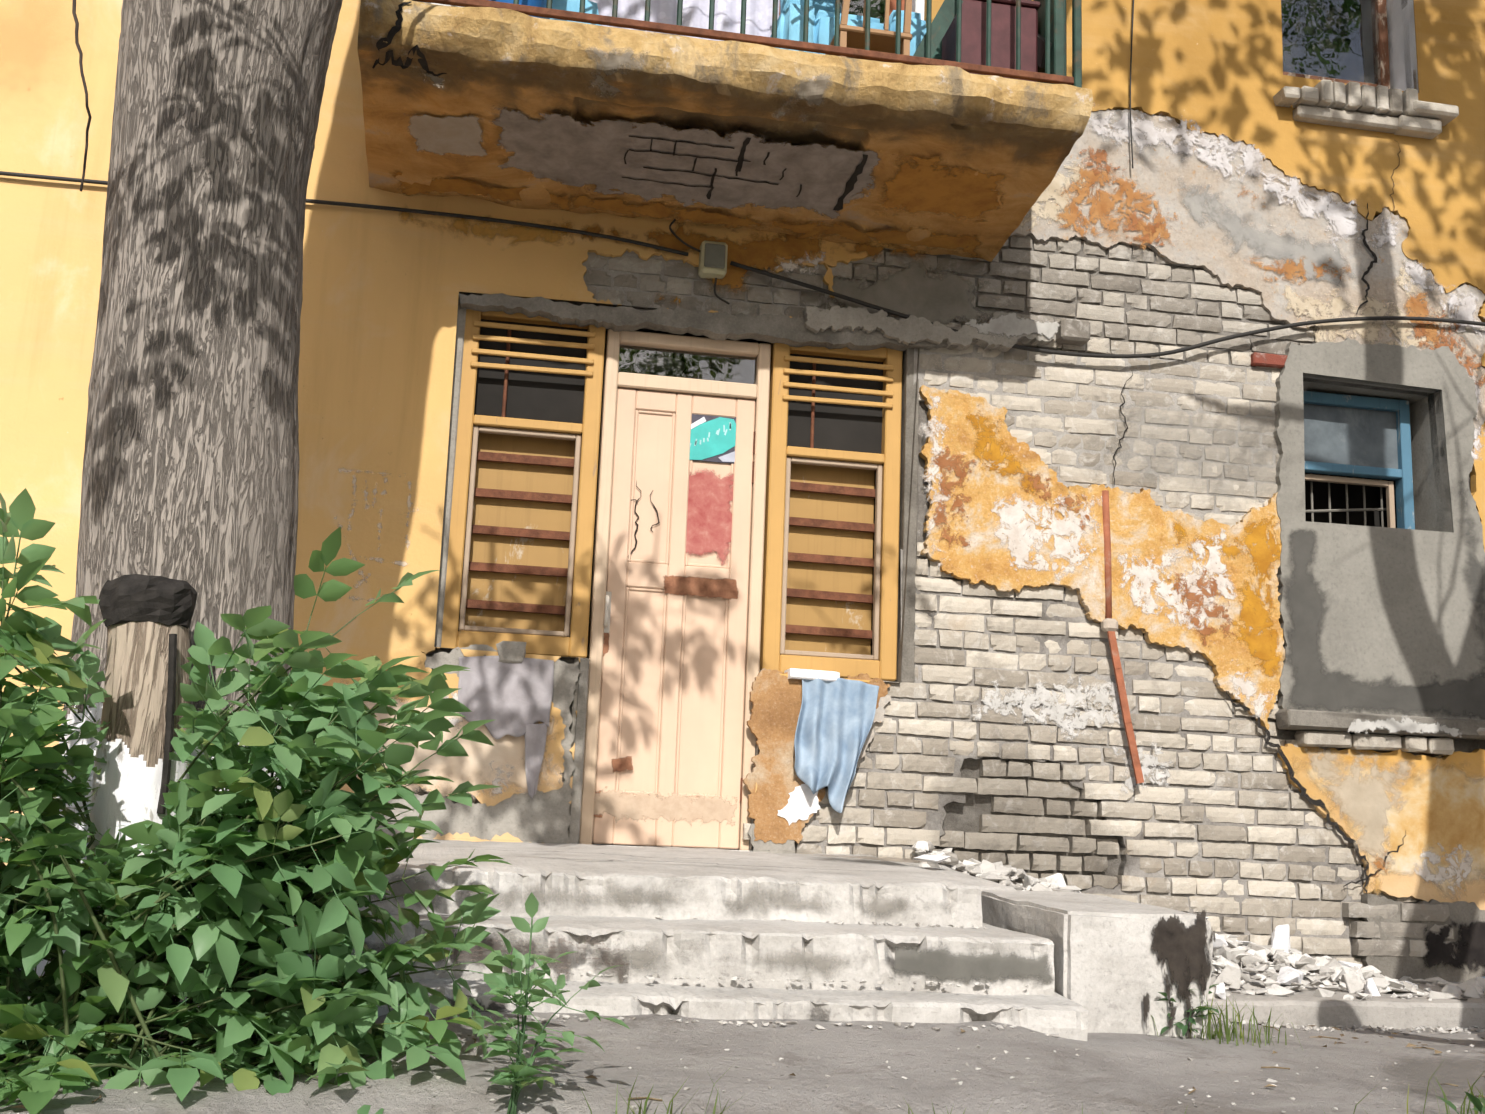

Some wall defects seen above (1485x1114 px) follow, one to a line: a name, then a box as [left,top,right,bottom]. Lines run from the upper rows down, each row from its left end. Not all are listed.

crack [372,1,447,76]
spalling [590,48,645,95]
spalling [776,74,831,119]
spalling [408,107,881,219]
flaking render [582,109,1485,982]
peeling [364,692,545,796]
corrosion [1101,618,1144,784]